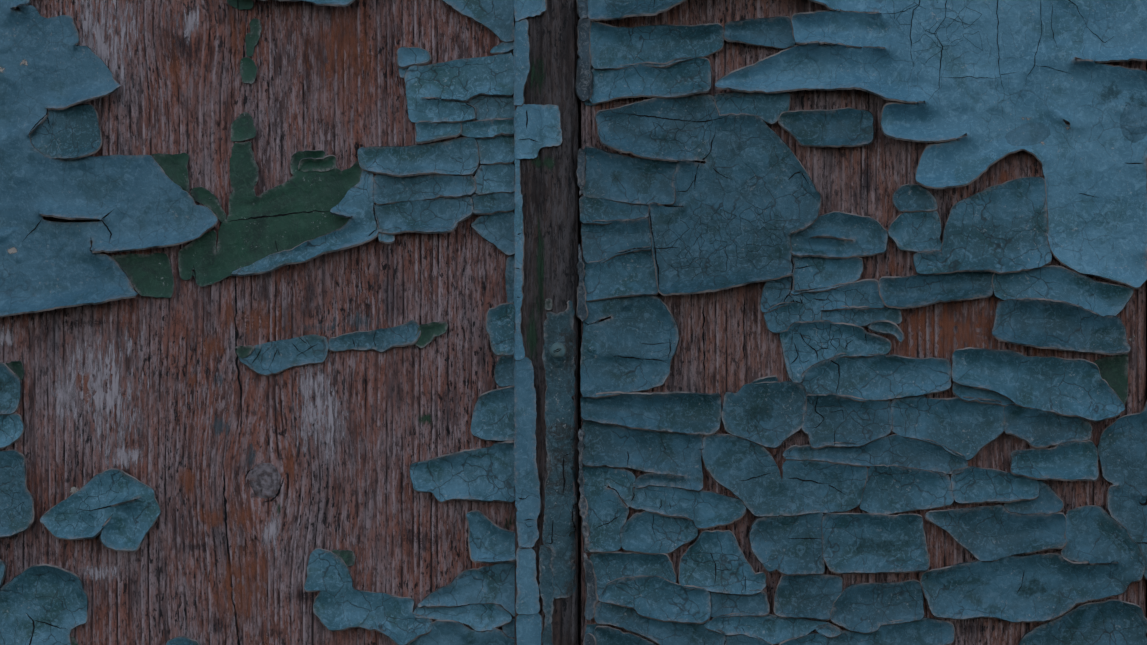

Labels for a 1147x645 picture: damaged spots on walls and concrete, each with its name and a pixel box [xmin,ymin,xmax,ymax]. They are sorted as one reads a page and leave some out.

peeling [0,0,579,645]
peeling [575,0,1147,645]
crack [884,0,1112,96]